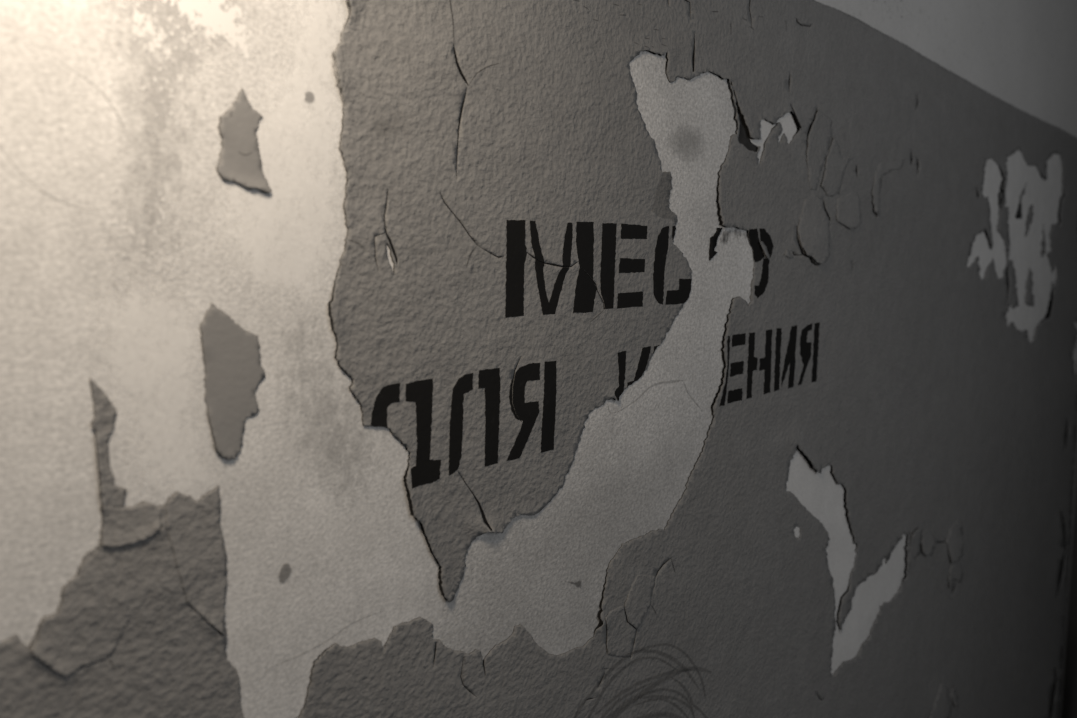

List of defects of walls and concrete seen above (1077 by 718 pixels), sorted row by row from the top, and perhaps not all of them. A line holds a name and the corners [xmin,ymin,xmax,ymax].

crack [374,191,398,272]
crack [454,48,468,169]
peeling [750,112,797,164]
peeling [967,150,1063,342]
peeling [0,0,770,718]
peeling [786,449,906,675]